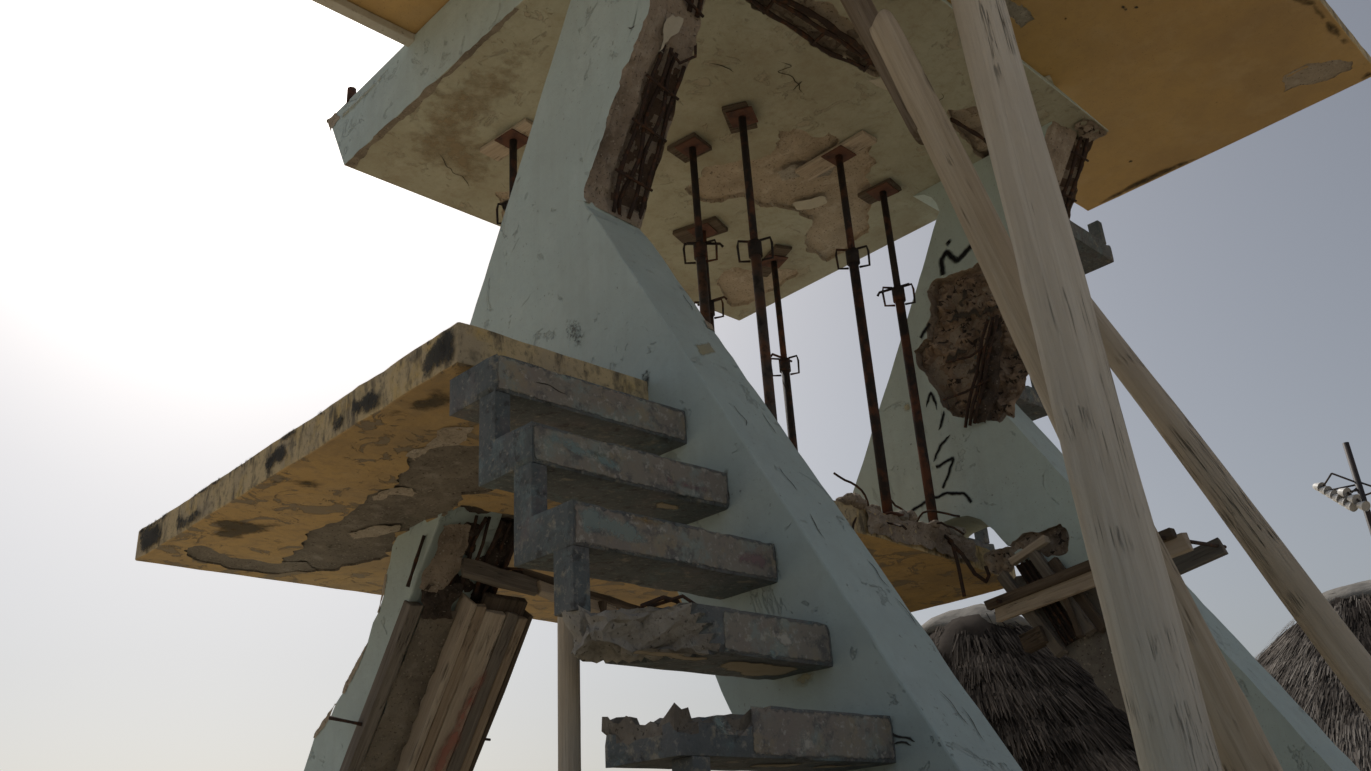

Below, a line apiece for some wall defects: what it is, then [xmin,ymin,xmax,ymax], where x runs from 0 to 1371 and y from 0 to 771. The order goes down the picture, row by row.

spalling [748,0,877,73]
spalling [575,0,706,229]
flaking render [686,129,875,258]
spalling [1041,116,1107,221]
spalling [920,269,1028,428]
leakage [265,445,286,473]
leakage [215,521,268,538]
spalling [833,472,1069,597]